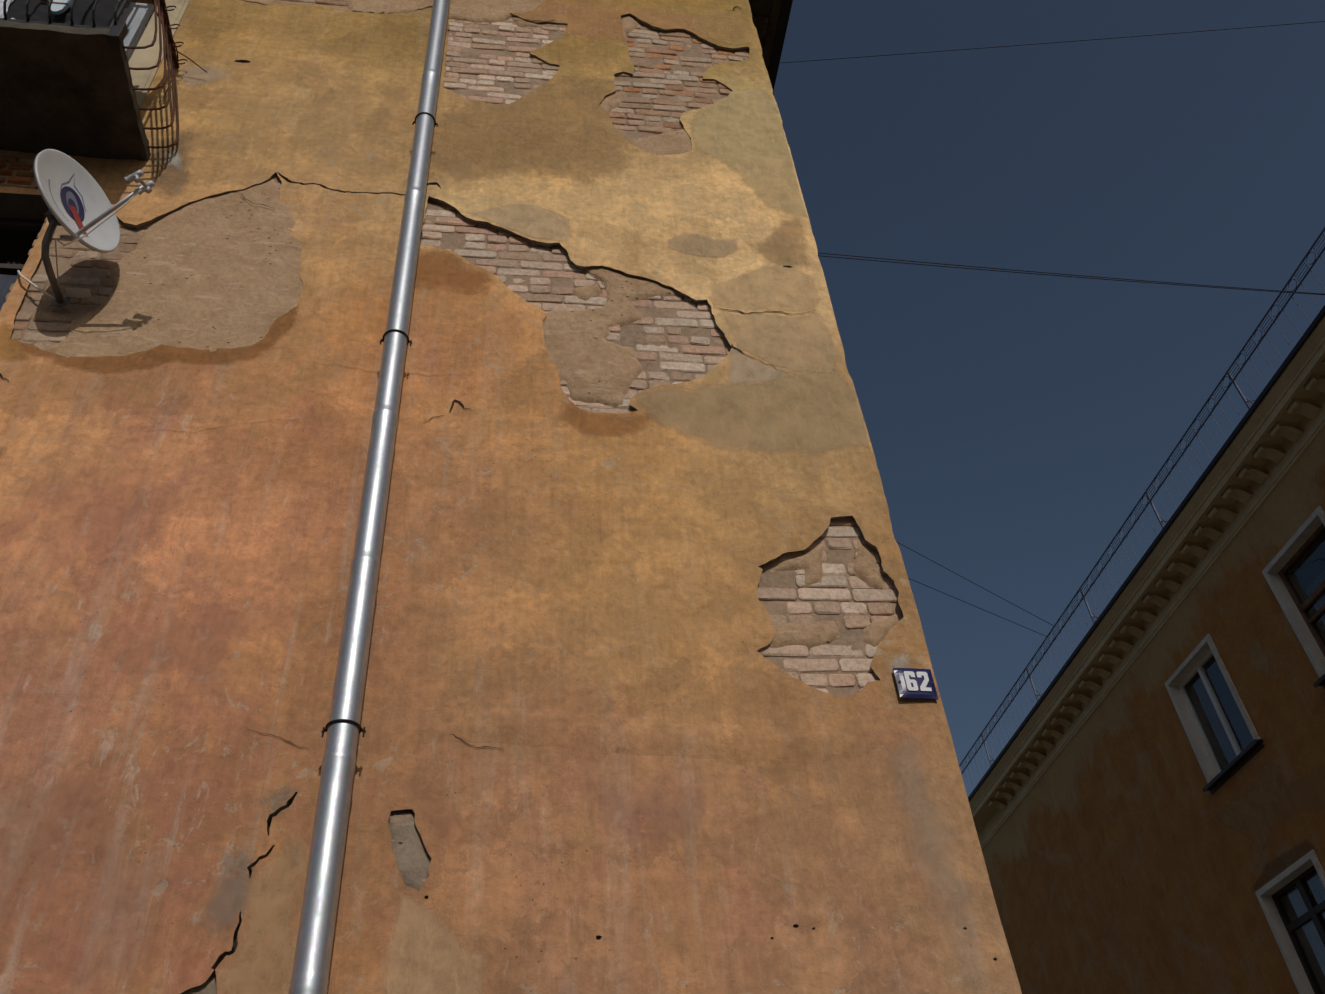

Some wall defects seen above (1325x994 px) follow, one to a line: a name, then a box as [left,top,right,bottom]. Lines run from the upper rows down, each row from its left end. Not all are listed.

spalling [245,0,433,14]
spalling [443,0,568,105]
spalling [599,13,750,156]
spalling [0,155,38,189]
crack [277,172,441,196]
spalling [0,172,303,359]
spalling [420,196,732,413]
spalling [757,516,904,698]
crack [247,792,298,878]
spalling [388,809,432,899]
spalling [180,969,217,994]
crack [212,911,242,974]